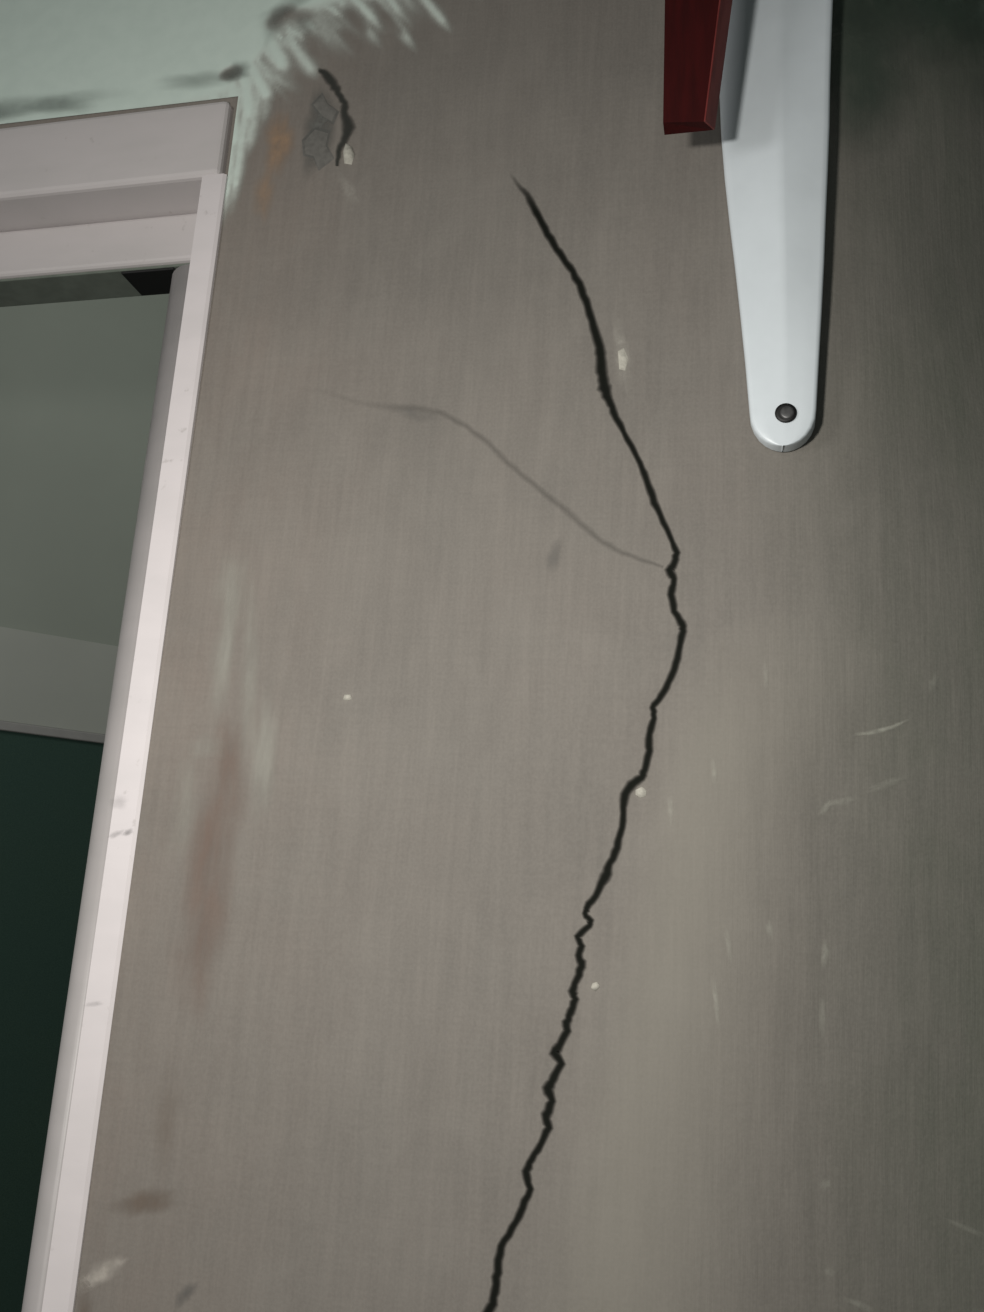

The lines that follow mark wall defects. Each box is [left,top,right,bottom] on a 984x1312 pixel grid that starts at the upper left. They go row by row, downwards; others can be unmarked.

flaking render [302,69,354,171]
crack [483,190,686,1312]